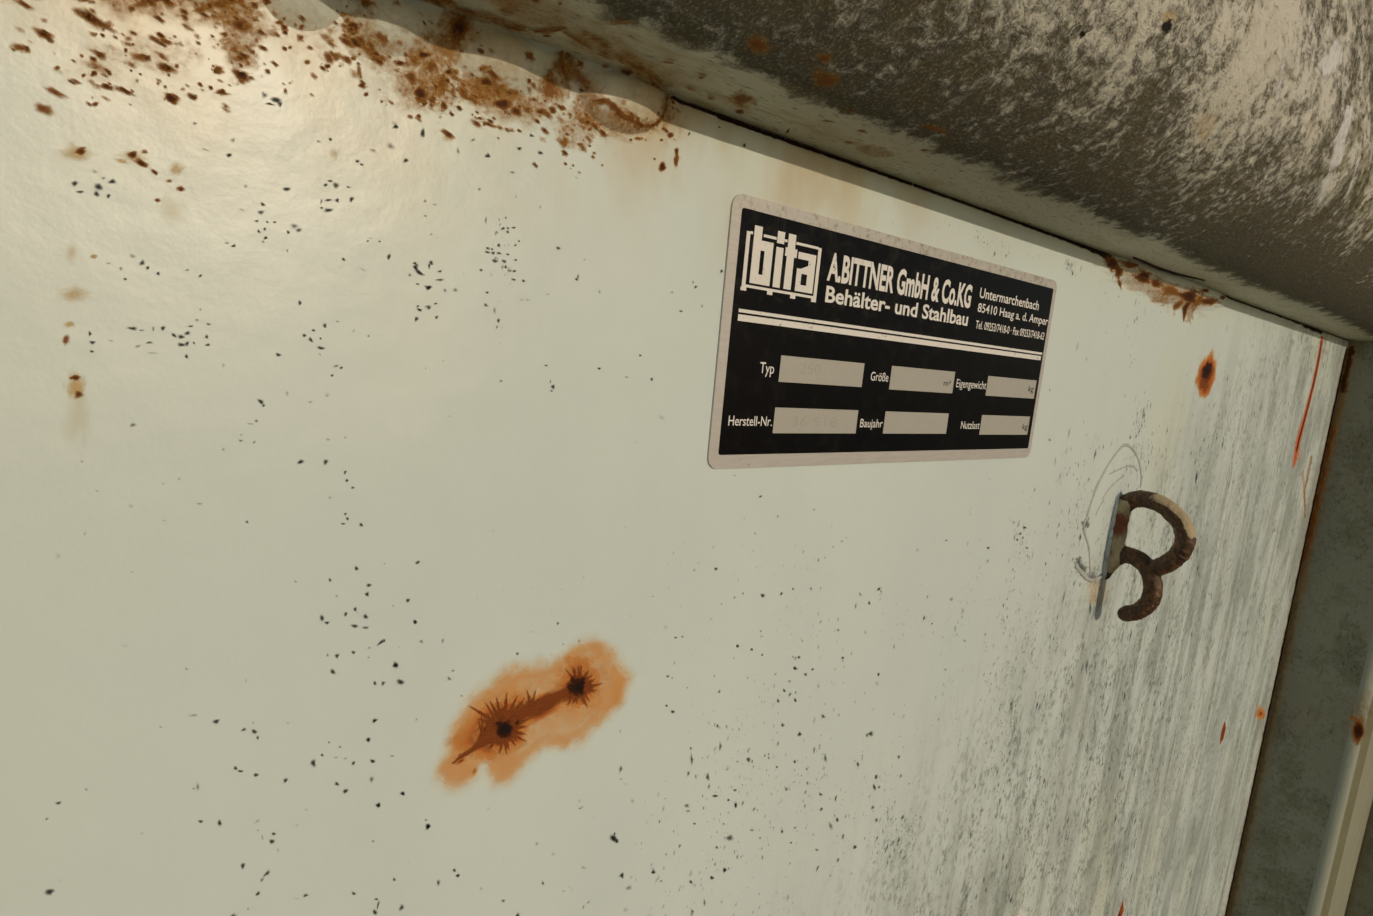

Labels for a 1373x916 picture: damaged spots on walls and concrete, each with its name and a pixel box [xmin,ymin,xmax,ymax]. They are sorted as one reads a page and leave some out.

corrosion [11,0,53,51]
corrosion [37,87,66,114]
leakage [129,309,210,358]
leakage [409,261,446,320]
corrosion [68,0,1323,467]
corrosion [1225,346,1355,916]
corrosion [439,642,627,785]
leakage [737,743,921,876]
leakage [969,653,1071,902]
corrosion [1351,707,1370,745]